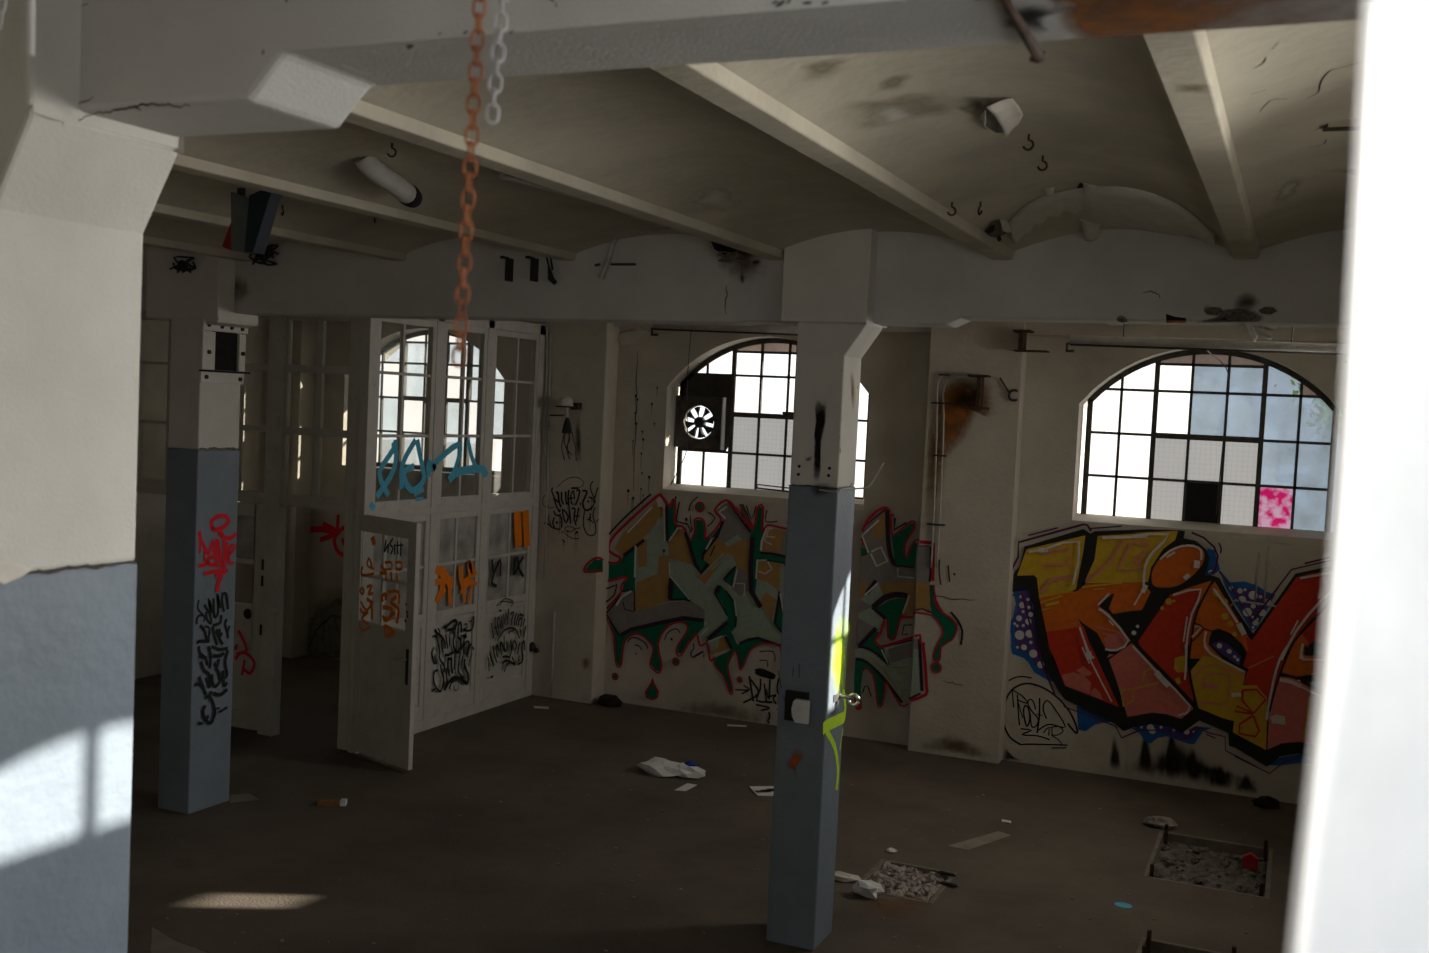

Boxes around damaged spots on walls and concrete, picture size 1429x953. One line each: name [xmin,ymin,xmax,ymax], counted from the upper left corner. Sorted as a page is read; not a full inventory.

corrosion [1055,0,1273,38]
crack [32,97,190,126]
crack [1309,63,1356,148]
corrosion [931,382,988,485]